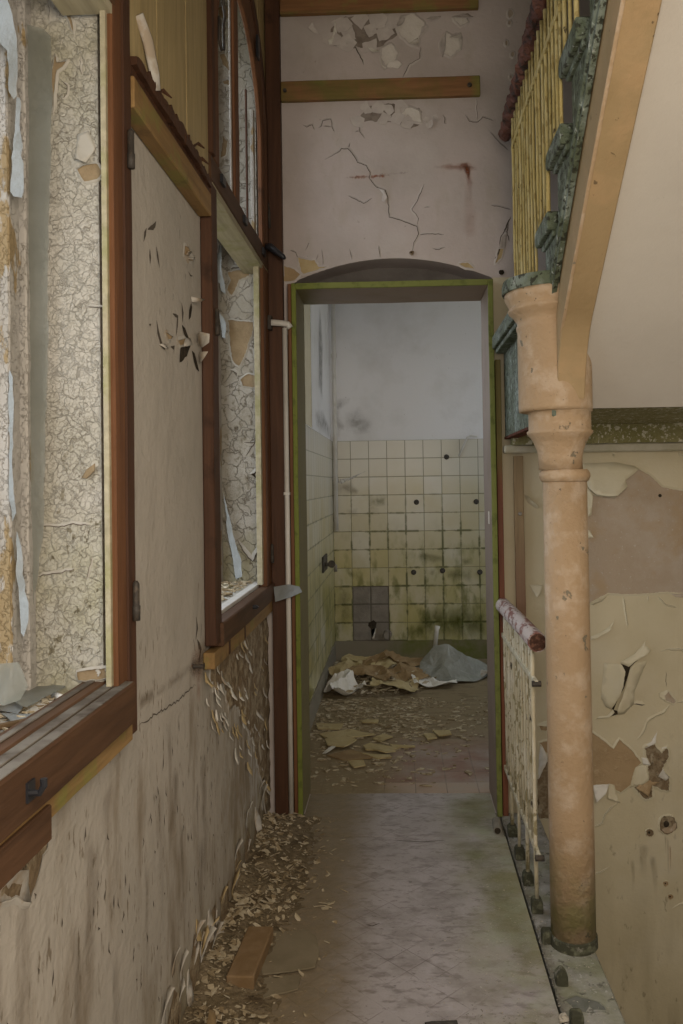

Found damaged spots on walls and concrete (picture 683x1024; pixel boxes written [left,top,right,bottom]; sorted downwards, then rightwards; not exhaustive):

peeling [322,13,473,69]
peeling [350,100,440,129]
crack [304,118,445,251]
peeling [149,297,210,371]
peeling [226,318,255,389]
crack [38,557,93,580]
crack [44,520,91,528]
peeling [583,462,683,640]
peeling [592,642,683,803]
flaking render [158,617,271,1024]
flaking render [0,834,53,909]